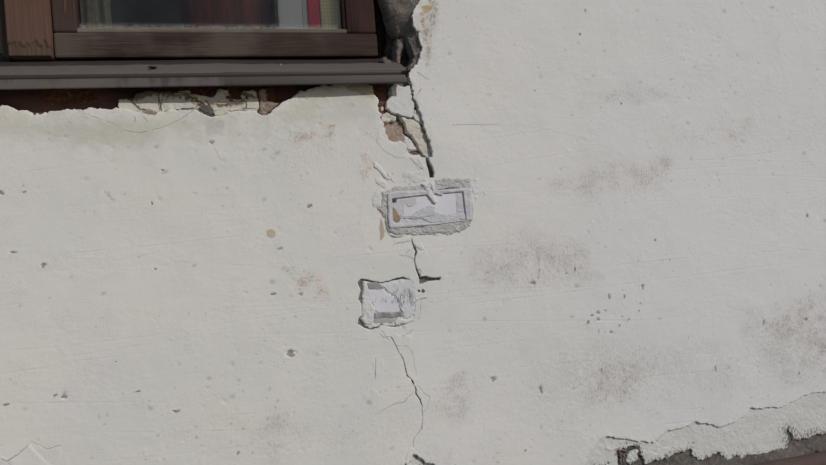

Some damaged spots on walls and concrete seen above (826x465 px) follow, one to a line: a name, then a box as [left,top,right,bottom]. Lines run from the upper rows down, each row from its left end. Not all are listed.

spalling [0,85,316,117]
spalling [367,0,431,188]
crack [412,151,433,177]
crack [379,222,439,443]
spalling [405,454,434,465]
peeling [585,392,826,465]